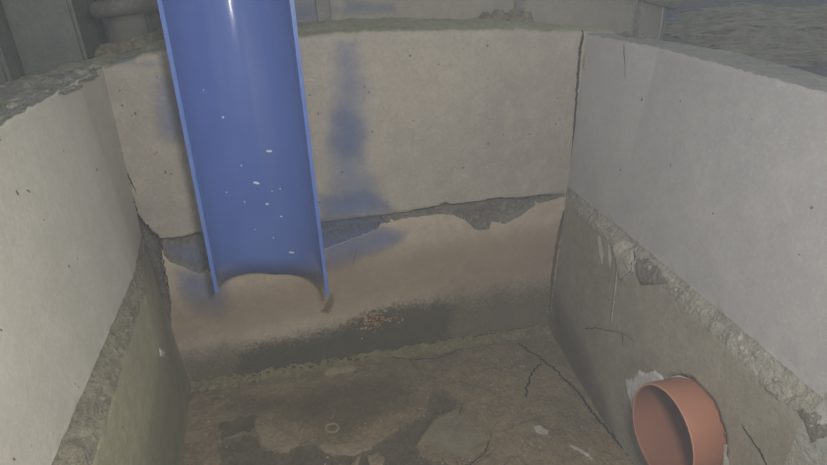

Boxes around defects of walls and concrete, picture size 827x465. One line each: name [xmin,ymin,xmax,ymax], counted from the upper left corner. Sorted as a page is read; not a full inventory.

crack [570,30,584,163]
spalling [321,194,565,249]
peeling [613,239,668,285]
damp [239,302,450,375]
crack [393,343,633,464]